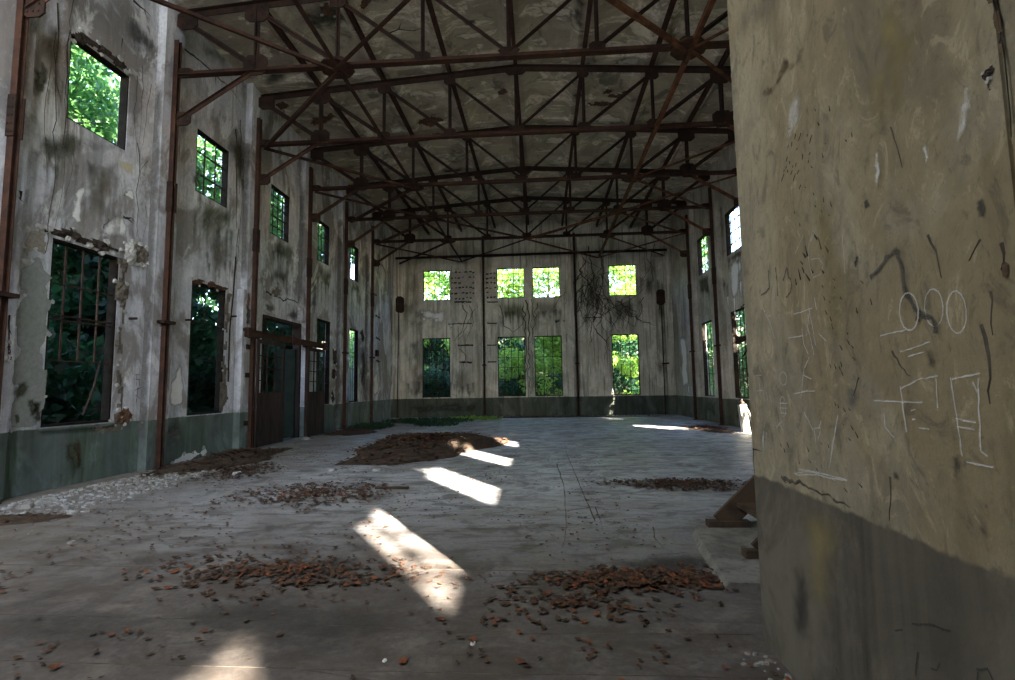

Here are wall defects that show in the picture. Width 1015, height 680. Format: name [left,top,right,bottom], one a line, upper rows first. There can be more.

mould [44,137,79,156]
peeling [6,223,149,434]
peeling [170,445,207,464]
crack [781,476,852,508]